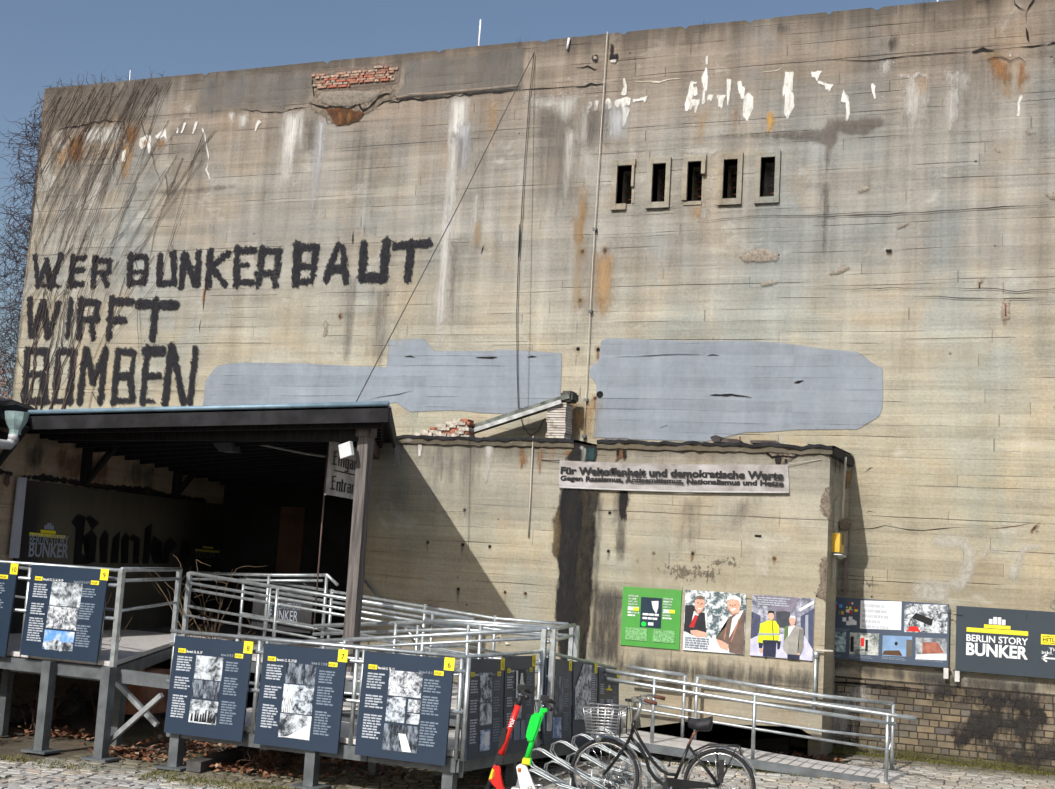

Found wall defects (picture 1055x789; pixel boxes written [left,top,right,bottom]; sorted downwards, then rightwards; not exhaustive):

crack [826,0,1055,63]
spalling [310,63,400,126]
crack [244,58,604,123]
crack [631,56,680,83]
water stain [437,99,469,322]
water stain [617,491,628,552]
water stain [552,488,621,670]
water stain [665,663,809,688]